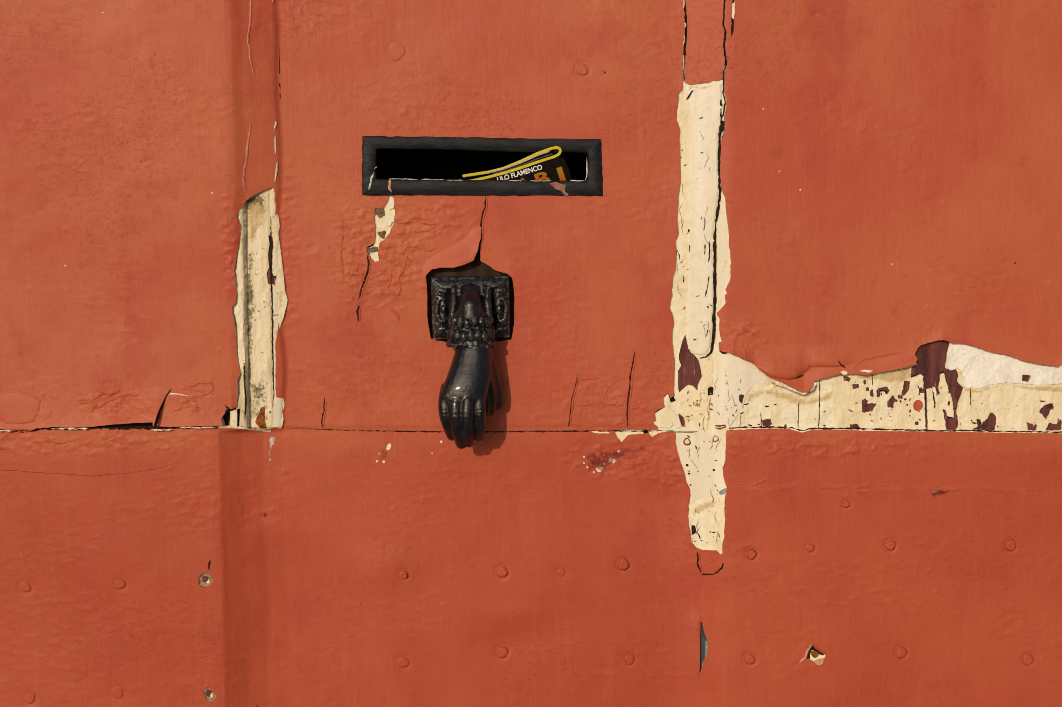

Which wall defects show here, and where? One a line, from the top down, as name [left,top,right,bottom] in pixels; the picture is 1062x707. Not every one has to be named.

crack [681,0,689,81]
crack [722,0,735,116]
peeling [366,195,395,262]
peeling [421,226,481,281]
peeling [222,188,288,430]
peeling [583,65,1062,554]
crack [0,397,441,433]